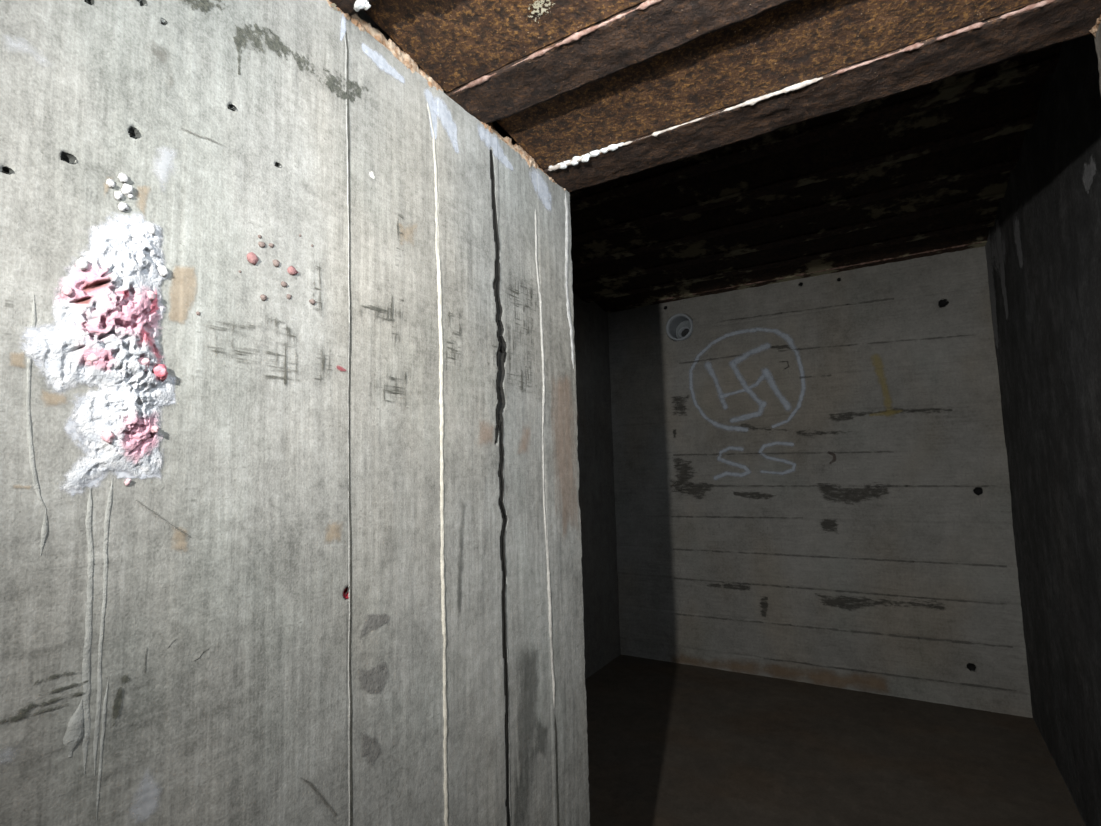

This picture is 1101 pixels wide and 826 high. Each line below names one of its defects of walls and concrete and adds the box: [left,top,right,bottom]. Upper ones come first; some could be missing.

leakage [340,0,371,41]
leakage [362,44,404,83]
efflorescence [454,73,497,93]
leakage [426,90,458,151]
leakage [479,127,513,170]
crack [490,149,510,826]
crack [553,718,561,826]